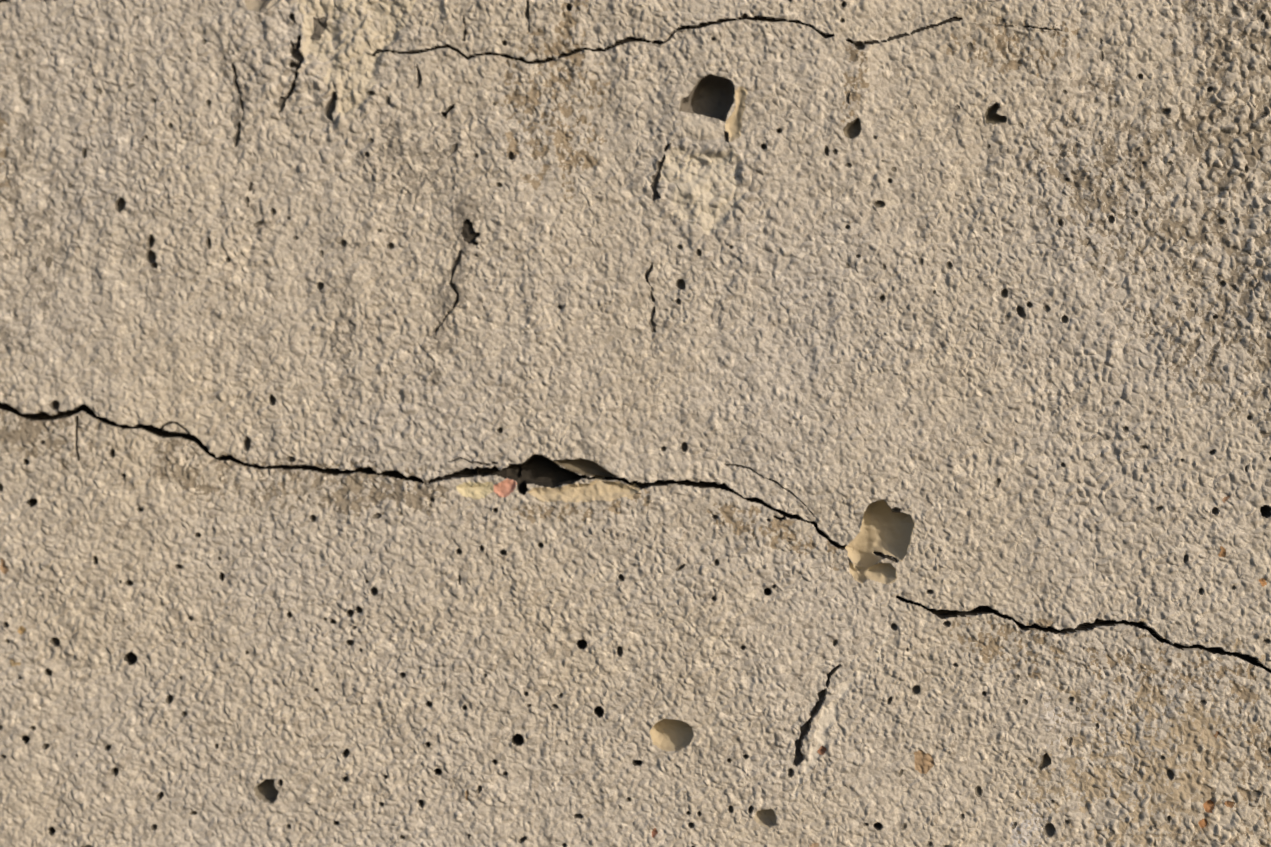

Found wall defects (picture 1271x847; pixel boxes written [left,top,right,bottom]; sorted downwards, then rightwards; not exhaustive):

spalling [297,0,416,117]
crack [372,0,963,89]
crack [994,23,1056,31]
spalling [659,74,747,235]
crack [0,403,898,563]
spalling [456,481,494,499]
spalling [528,458,640,503]
hole [845,500,916,585]
crack [896,596,1271,673]
hole [650,719,694,752]
crack [793,665,839,767]